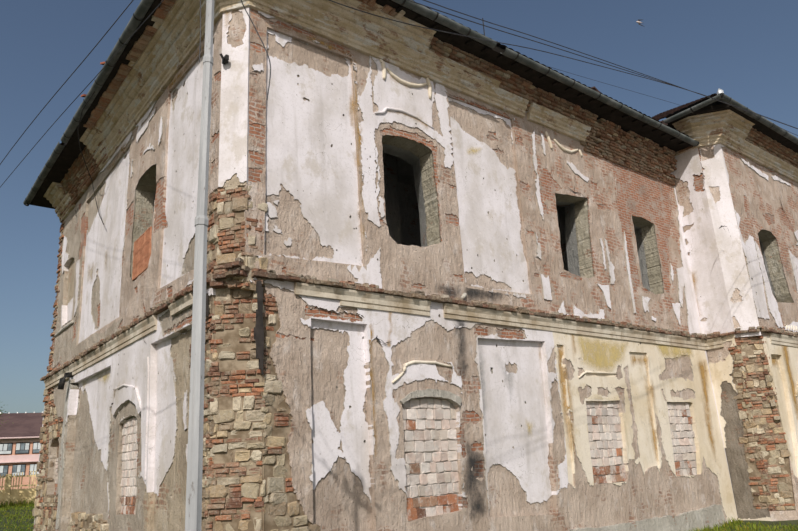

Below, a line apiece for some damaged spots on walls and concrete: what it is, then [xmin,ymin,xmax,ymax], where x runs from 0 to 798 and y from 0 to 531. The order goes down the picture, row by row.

spalling [47,37,205,373]
flaking render [83,0,177,129]
flaking render [201,8,798,531]
water stain [466,451,482,512]